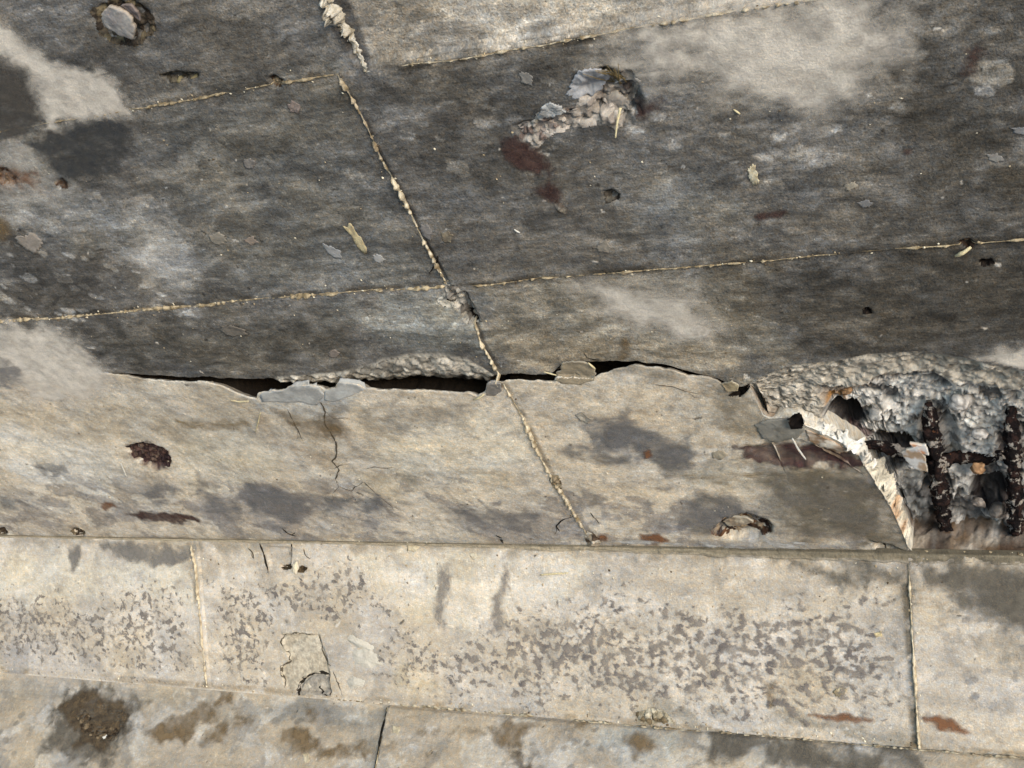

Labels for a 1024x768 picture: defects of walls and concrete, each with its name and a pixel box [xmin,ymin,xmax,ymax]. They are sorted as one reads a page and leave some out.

spalling [90,0,157,47]
damp [0,26,130,178]
spalling [518,64,641,149]
corrosion [502,136,561,202]
corrosion [127,442,166,470]
crack [108,351,768,508]
spalling [748,351,1024,551]
corrosion [133,512,200,525]
spalling [710,512,772,537]
damp [42,684,141,768]
corrosion [808,713,871,723]
corrosion [923,716,968,734]